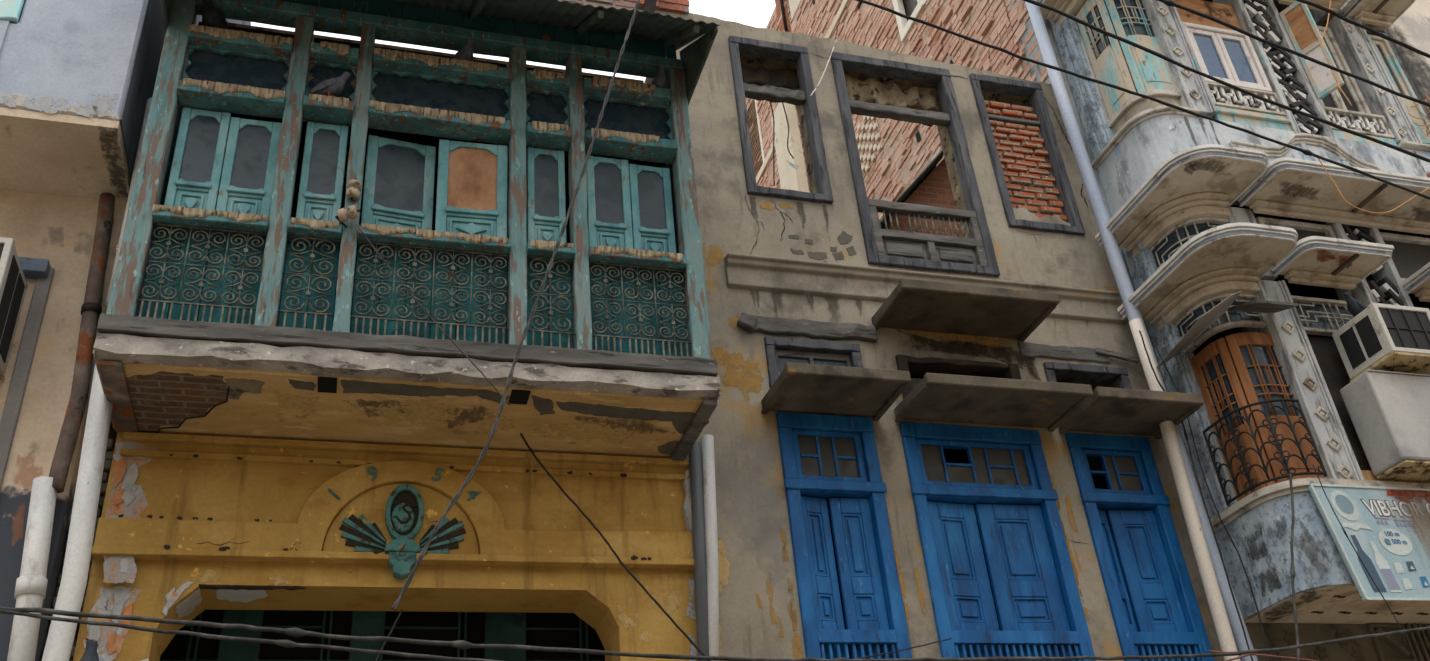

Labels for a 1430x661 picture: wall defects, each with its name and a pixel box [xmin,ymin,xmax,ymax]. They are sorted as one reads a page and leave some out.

damp [1384,28,1430,122]
spalling [105,371,265,521]
peeling [83,555,141,661]
damp [1247,517,1328,622]